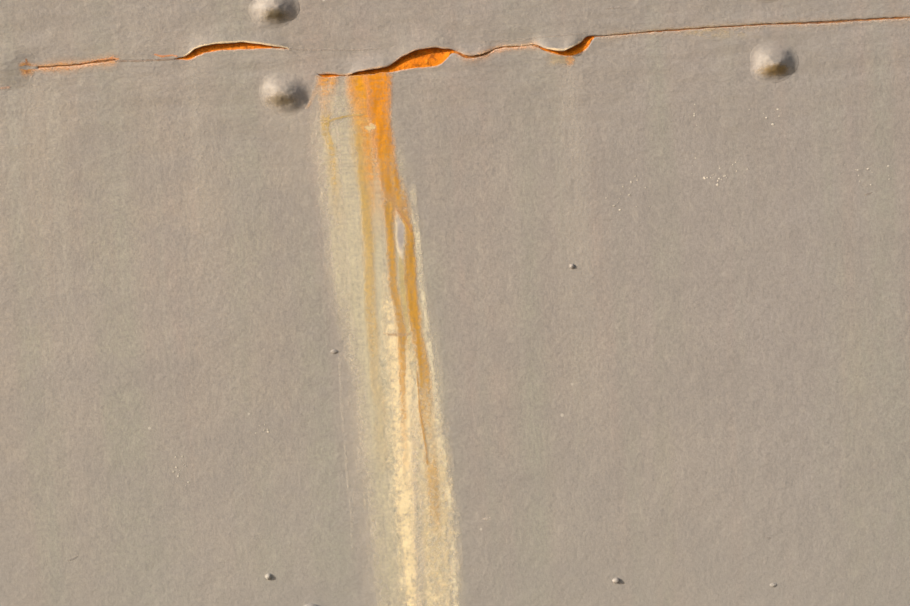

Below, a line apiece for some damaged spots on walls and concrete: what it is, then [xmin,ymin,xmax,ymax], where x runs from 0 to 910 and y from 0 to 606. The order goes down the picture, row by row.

crack [594,17,910,38]
crack [38,54,177,70]
crack [454,44,539,59]
rust [551,55,574,64]
rust [322,73,458,606]